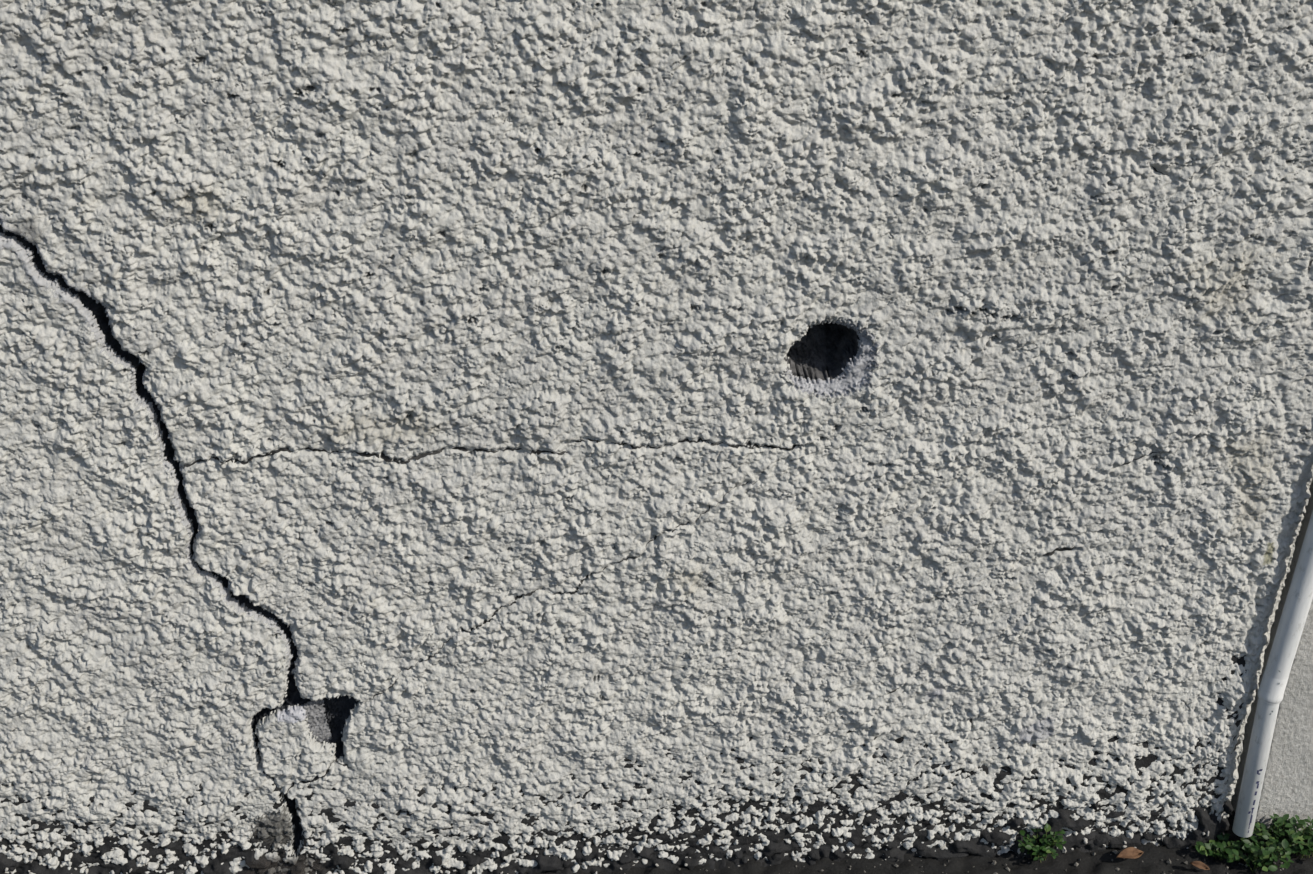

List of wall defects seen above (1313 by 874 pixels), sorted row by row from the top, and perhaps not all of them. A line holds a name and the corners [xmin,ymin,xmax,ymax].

spalling [784,318,880,399]
crack [0,214,807,848]
peeling [0,651,1247,874]